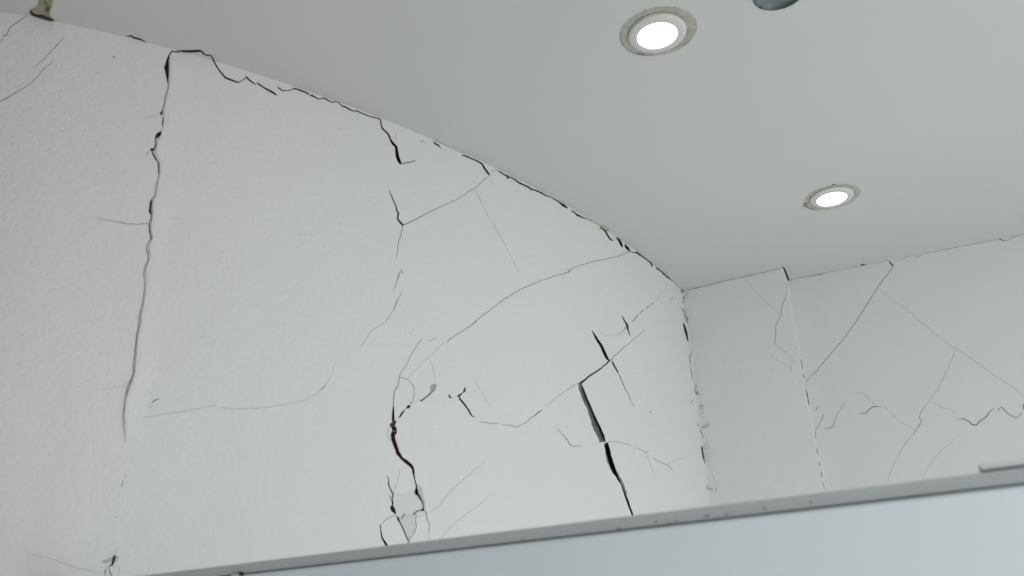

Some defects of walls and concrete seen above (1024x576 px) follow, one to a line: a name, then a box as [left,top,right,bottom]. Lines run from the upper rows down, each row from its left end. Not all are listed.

crack [97,35,416,442]
flaking render [380,471,430,546]
crack [362,139,1024,534]